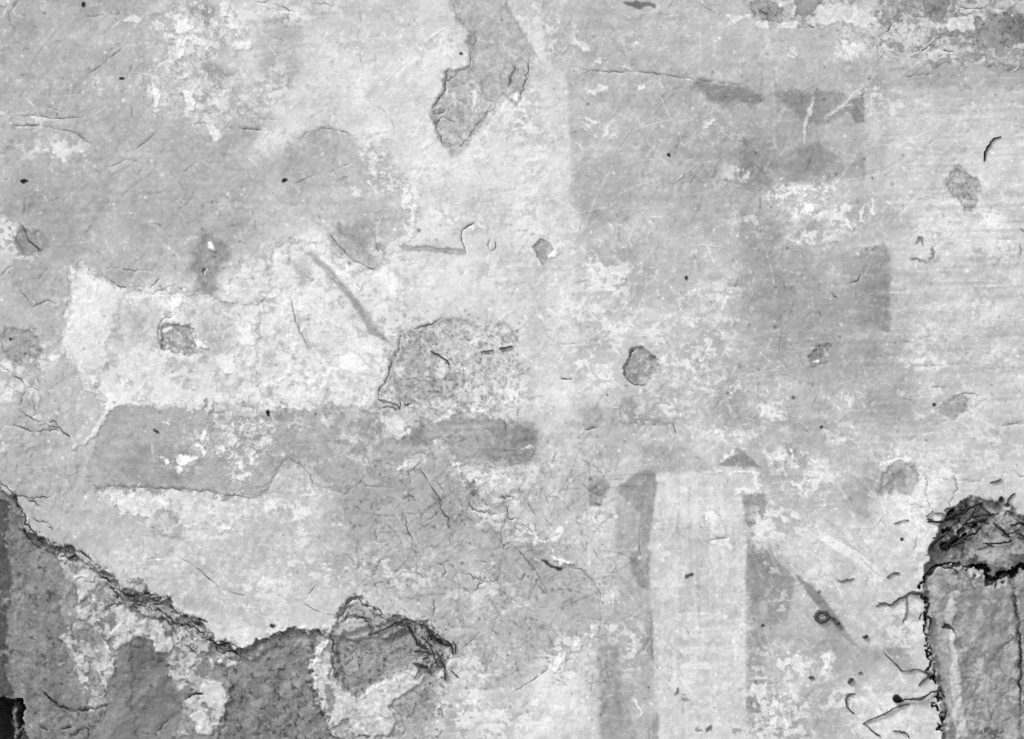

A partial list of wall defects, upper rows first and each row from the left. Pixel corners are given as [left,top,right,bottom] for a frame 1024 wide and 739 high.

flaking render [430,0,536,155]
flaking render [0,487,459,739]
flaking render [917,493,1024,739]